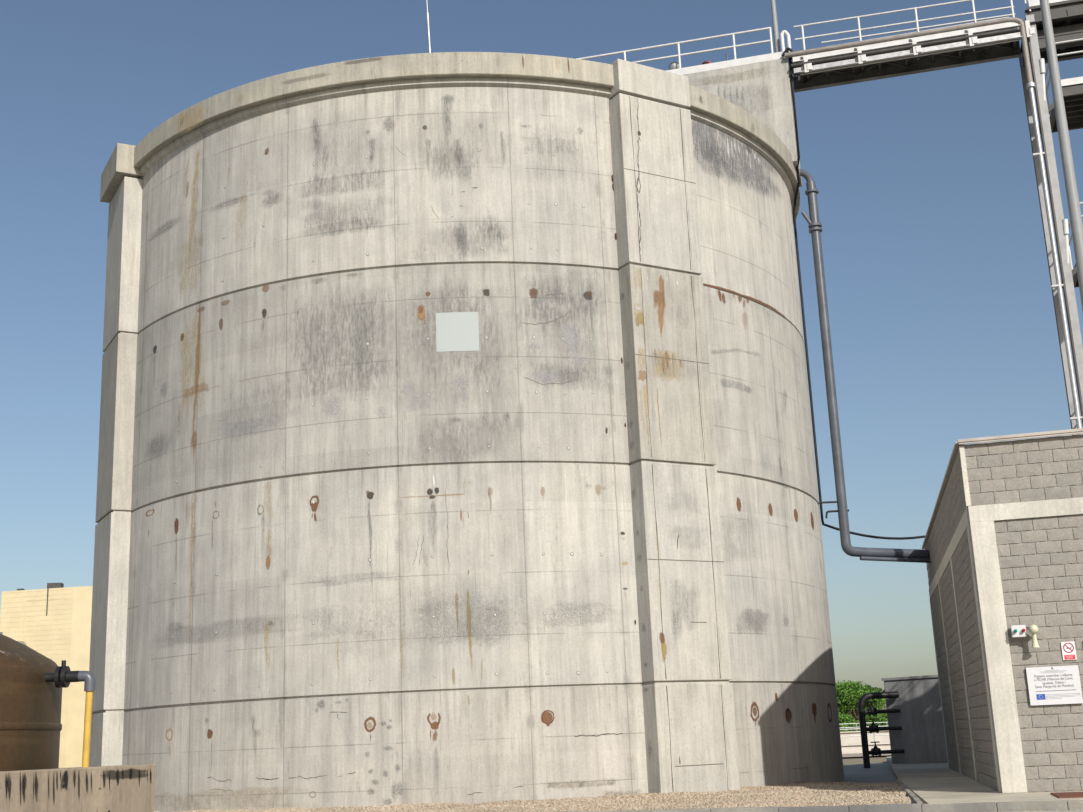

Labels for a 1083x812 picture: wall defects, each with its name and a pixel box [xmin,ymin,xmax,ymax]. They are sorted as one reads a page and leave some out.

damp [692,121,773,193]
rust [310,495,319,521]
rust [364,716,376,739]
rust [427,713,441,740]
rust [541,710,554,726]
damp [5,769,151,803]